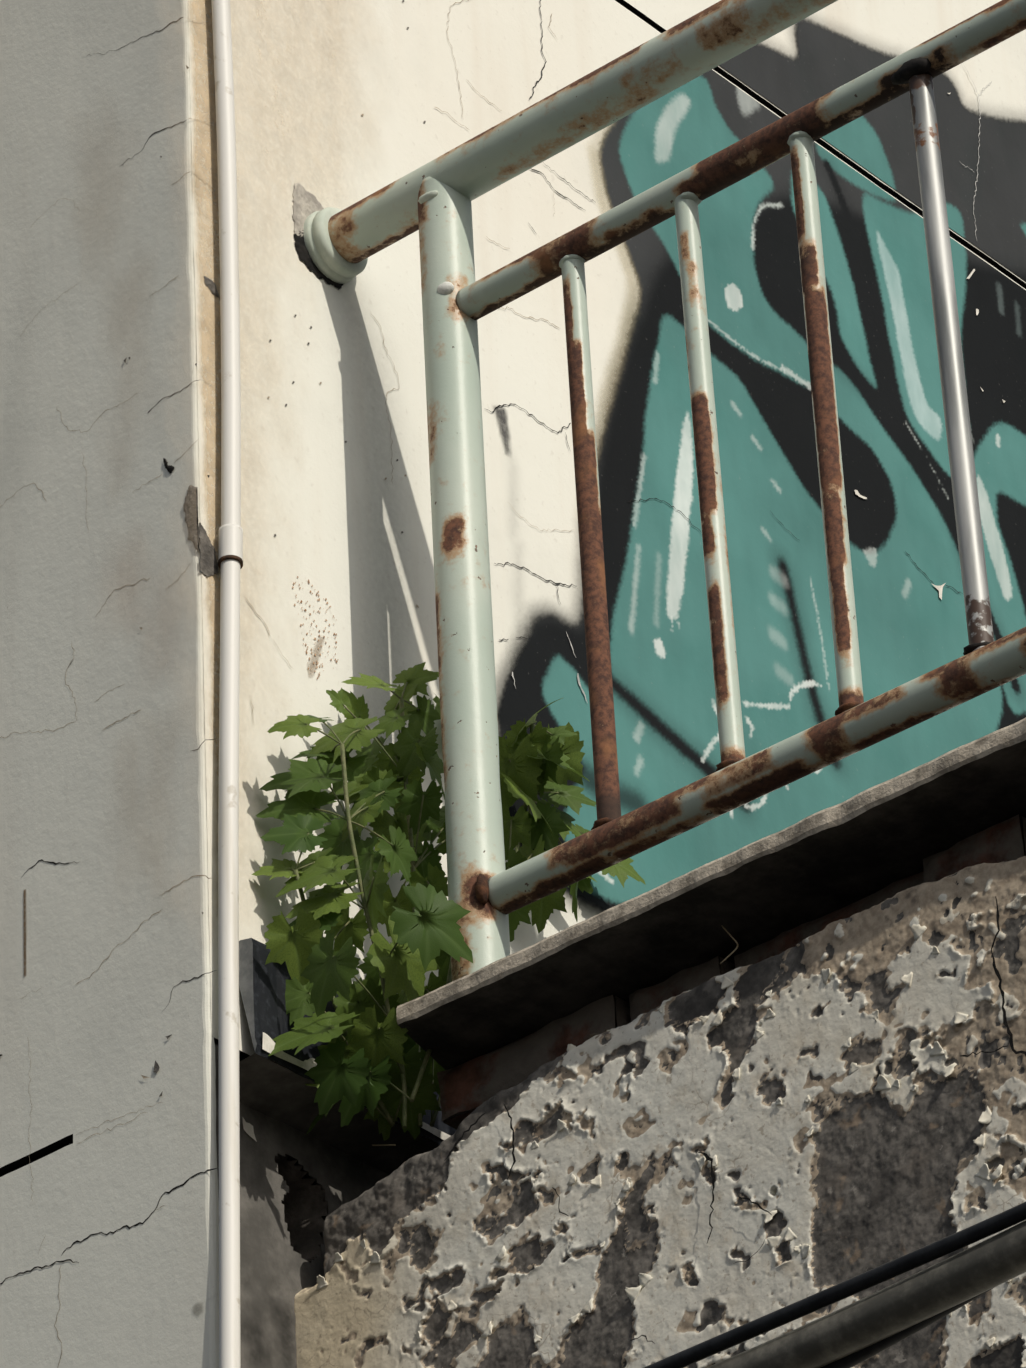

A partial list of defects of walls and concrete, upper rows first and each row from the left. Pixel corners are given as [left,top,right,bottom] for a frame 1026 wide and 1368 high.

crack [435,0,558,129]
crack [57,379,214,528]
spalling [183,475,219,577]
crack [23,859,79,875]
crack [77,875,210,984]
crack [961,896,1026,1057]
spalling [262,1032,317,1071]
spalling [638,856,1026,1303]
peeling [275,1044,576,1291]
crack [0,1168,217,1365]
spalling [463,1150,666,1368]
spalling [857,1273,1026,1368]